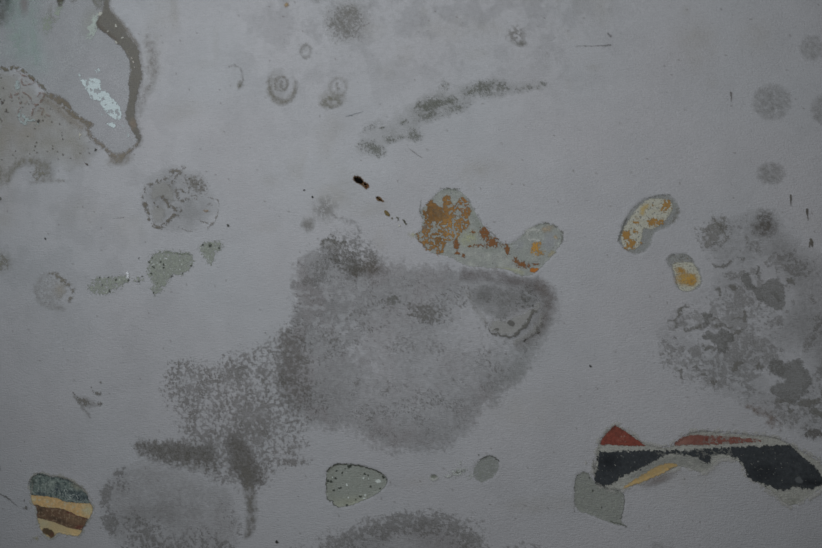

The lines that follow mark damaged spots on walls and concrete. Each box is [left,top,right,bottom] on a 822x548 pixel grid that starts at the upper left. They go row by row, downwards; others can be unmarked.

peeling [0,0,143,163]
peeling [412,188,563,276]
peeling [620,195,679,253]
spalling [87,241,221,296]
peeling [668,253,701,291]
spalling [325,463,387,507]
spalling [574,472,626,526]